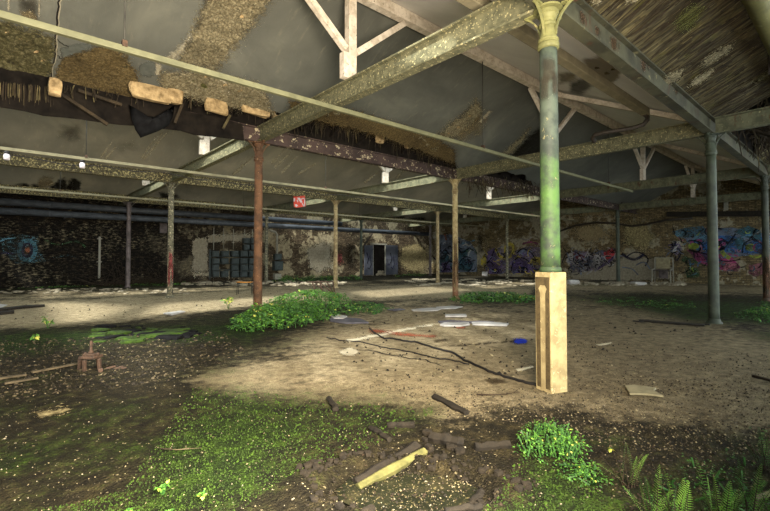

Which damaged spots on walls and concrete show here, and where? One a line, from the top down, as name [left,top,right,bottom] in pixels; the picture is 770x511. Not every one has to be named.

crack [51,0,68,77]
flaking render [0,0,302,118]
flaking render [309,96,490,167]